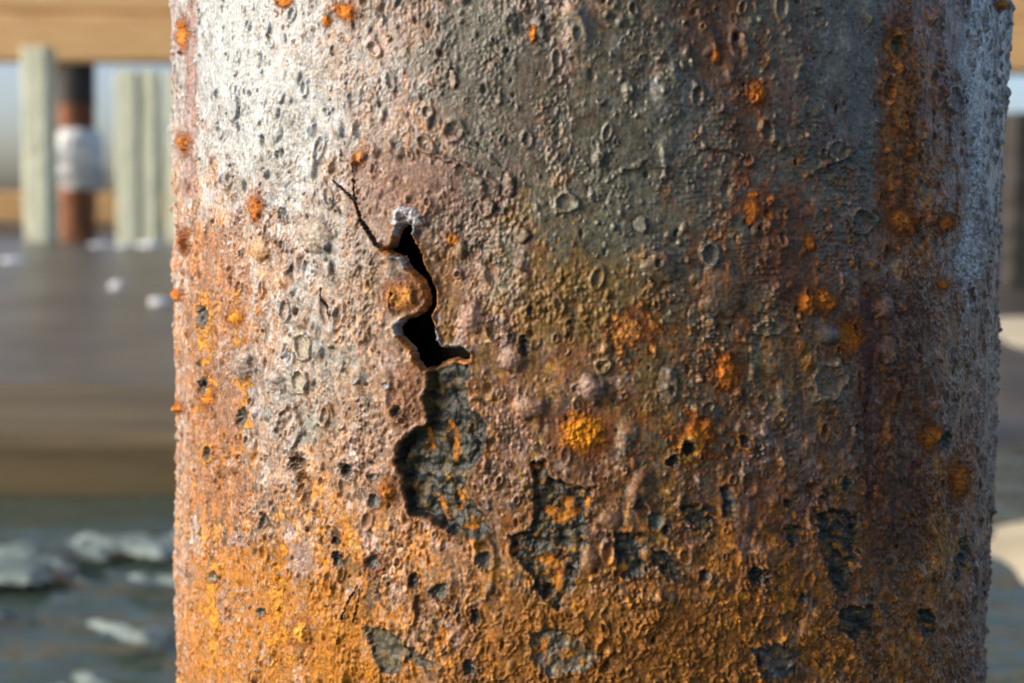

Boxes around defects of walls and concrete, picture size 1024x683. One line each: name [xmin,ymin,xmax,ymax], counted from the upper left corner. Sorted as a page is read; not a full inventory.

rust [174,0,198,197]
rust [874,9,957,256]
rust [176,227,192,256]
rust [246,187,264,224]
crack [333,164,388,252]
rust [170,289,250,415]
spalling [394,358,598,611]
rust [550,401,615,470]
rust [525,266,667,410]
rust [651,350,744,477]
rust [184,539,417,683]
spalling [362,624,439,677]